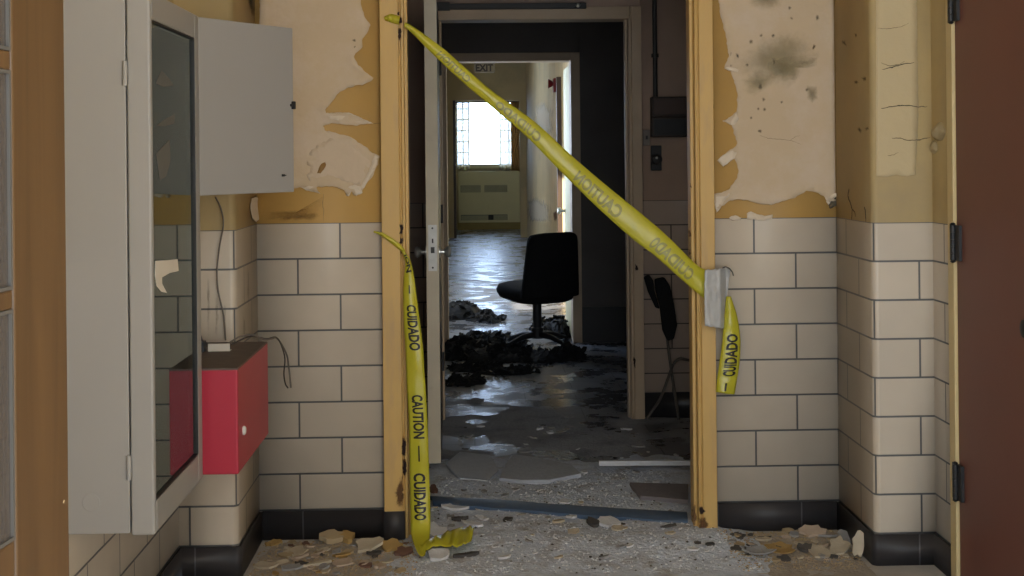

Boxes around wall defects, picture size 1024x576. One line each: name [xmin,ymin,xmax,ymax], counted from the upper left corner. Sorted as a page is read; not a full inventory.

peeling [259,0,380,196]
peeling [714,0,836,221]